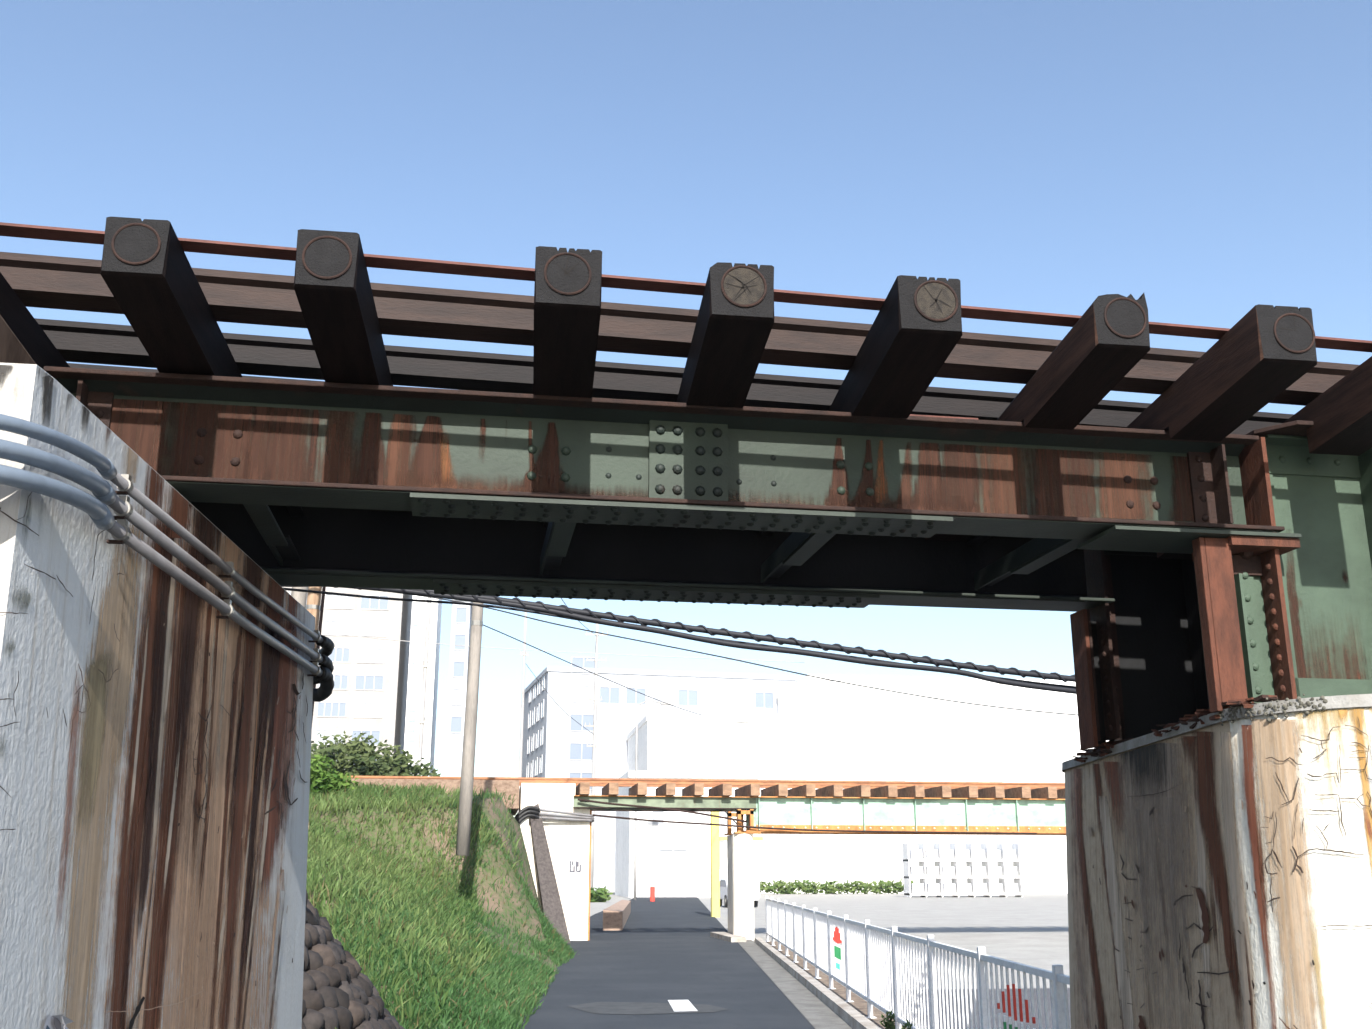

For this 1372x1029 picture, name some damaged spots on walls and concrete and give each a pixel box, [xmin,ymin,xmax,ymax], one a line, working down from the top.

damp [16,590,32,608]
crack [0,492,124,748]
rust [104,399,648,1029]
rust [1071,738,1130,1029]
rust [1151,695,1278,1029]
crack [1261,717,1372,912]